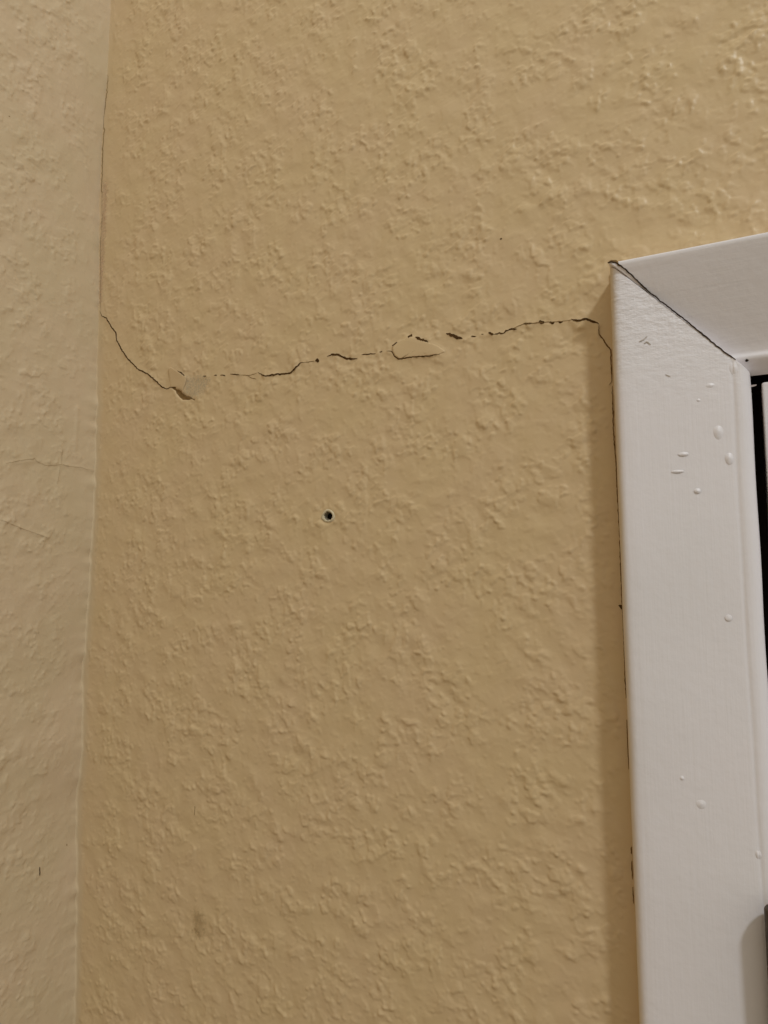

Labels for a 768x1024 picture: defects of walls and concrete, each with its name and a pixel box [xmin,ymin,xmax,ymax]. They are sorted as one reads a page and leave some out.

crack [100,90,108,192]
peeling [168,367,195,400]
crack [100,225,626,694]